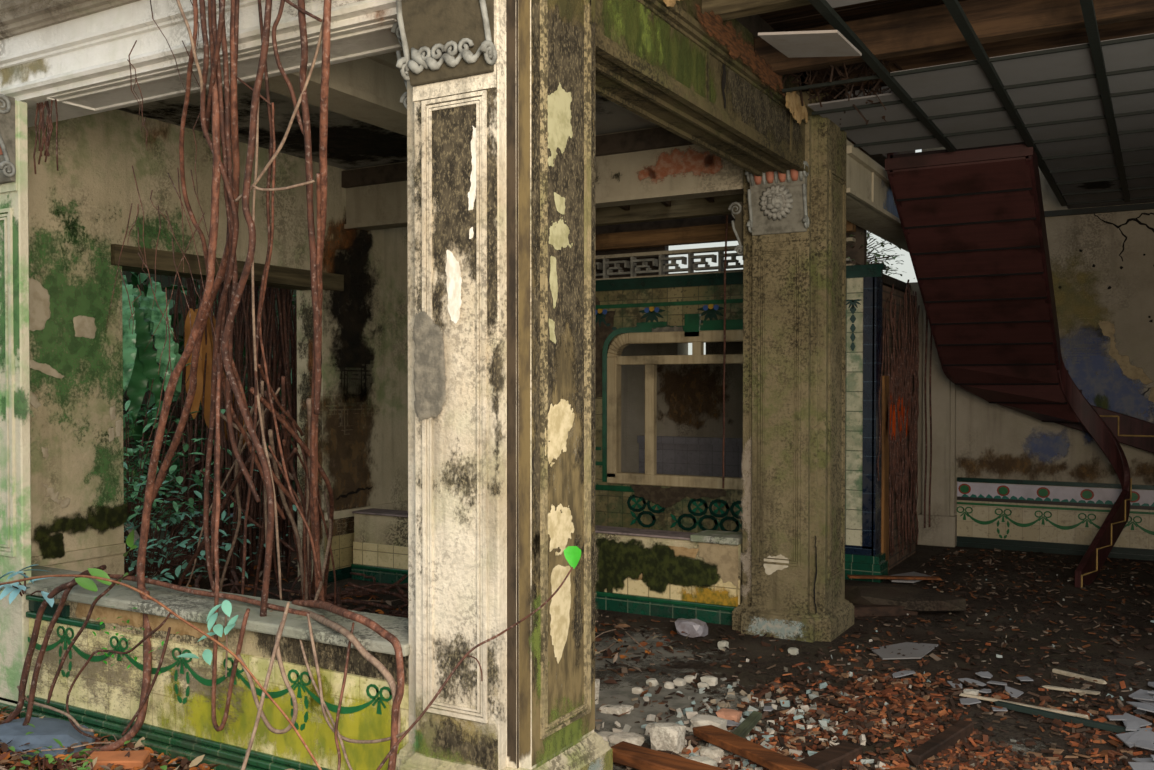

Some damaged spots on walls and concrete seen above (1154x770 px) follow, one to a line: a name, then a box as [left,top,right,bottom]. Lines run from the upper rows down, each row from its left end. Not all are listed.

spalling [695,4,808,124]
leakage [50,188,85,252]
crack [1094,213,1154,261]
flaking render [29,278,51,331]
leakage [410,66,505,523]
peeling [30,360,64,379]
leakage [297,215,382,515]
spalling [413,311,447,421]
flaking render [545,399,574,467]
leakage [956,450,1116,482]
flaking render [548,503,574,663]
leakage [254,632,409,708]